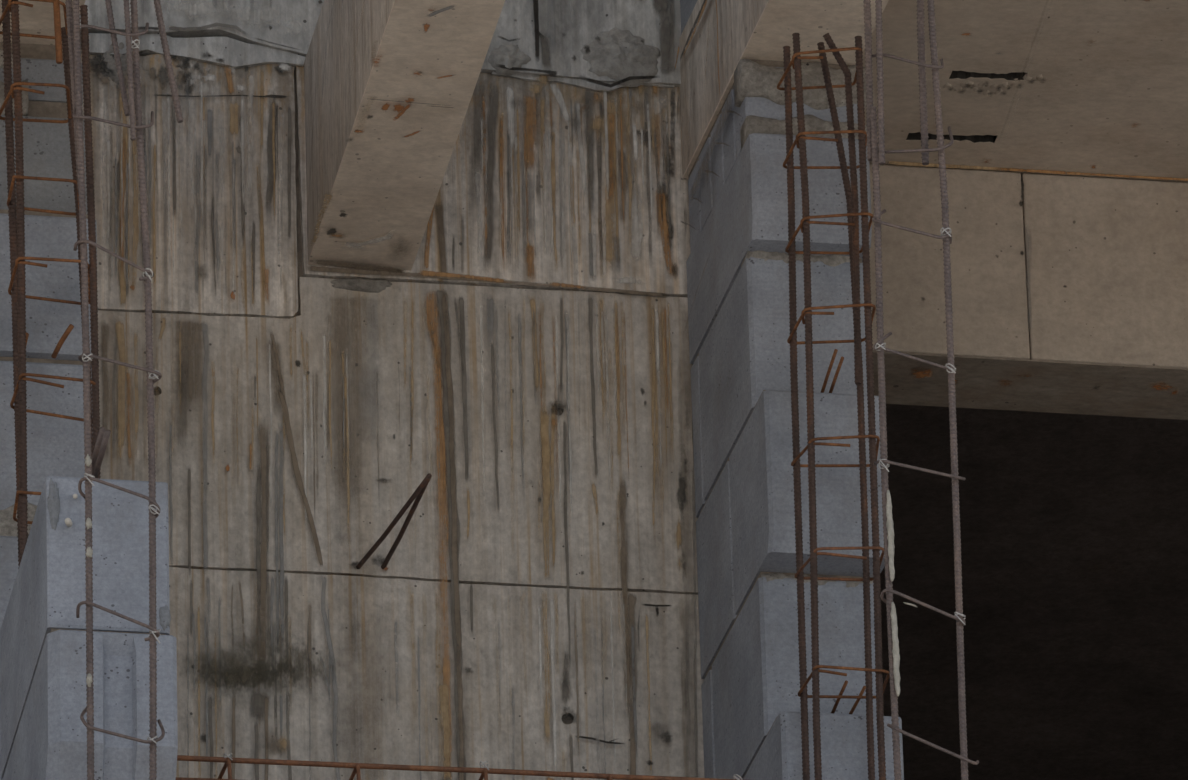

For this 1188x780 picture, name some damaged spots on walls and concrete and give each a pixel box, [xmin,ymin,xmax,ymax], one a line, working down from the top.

leakage [107,53,255,292]
leakage [266,103,292,237]
rust [349,98,414,141]
rust [517,75,557,264]
rust [572,94,632,262]
rust [656,192,672,274]
rust [308,207,665,525]
leakage [179,320,359,780]
rust [404,294,451,780]
rust [538,406,555,576]
rust [617,481,630,707]